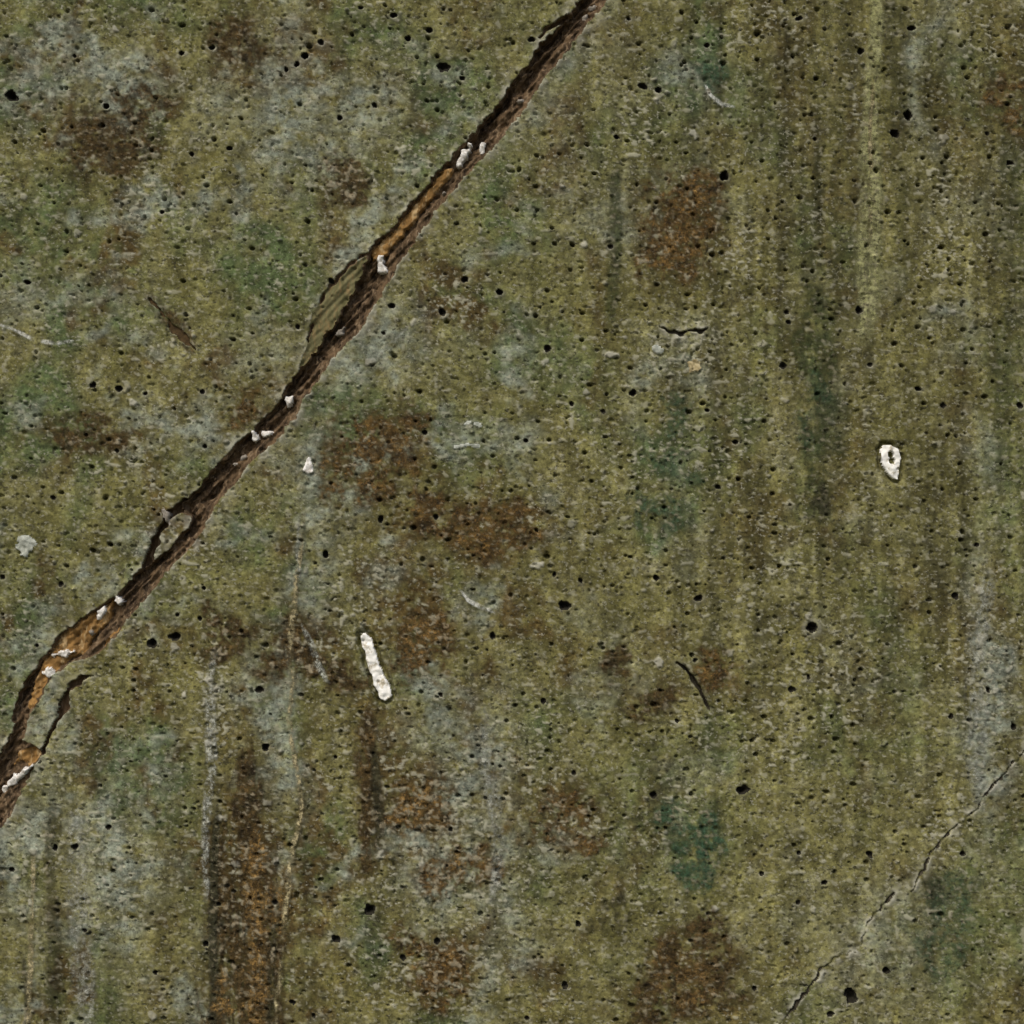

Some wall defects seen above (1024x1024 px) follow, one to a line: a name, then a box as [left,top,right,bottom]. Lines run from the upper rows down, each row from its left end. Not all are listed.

rust [634,169,726,283]
crack [0,0,607,828]
crack [676,662,710,710]
rust [200,745,285,1024]